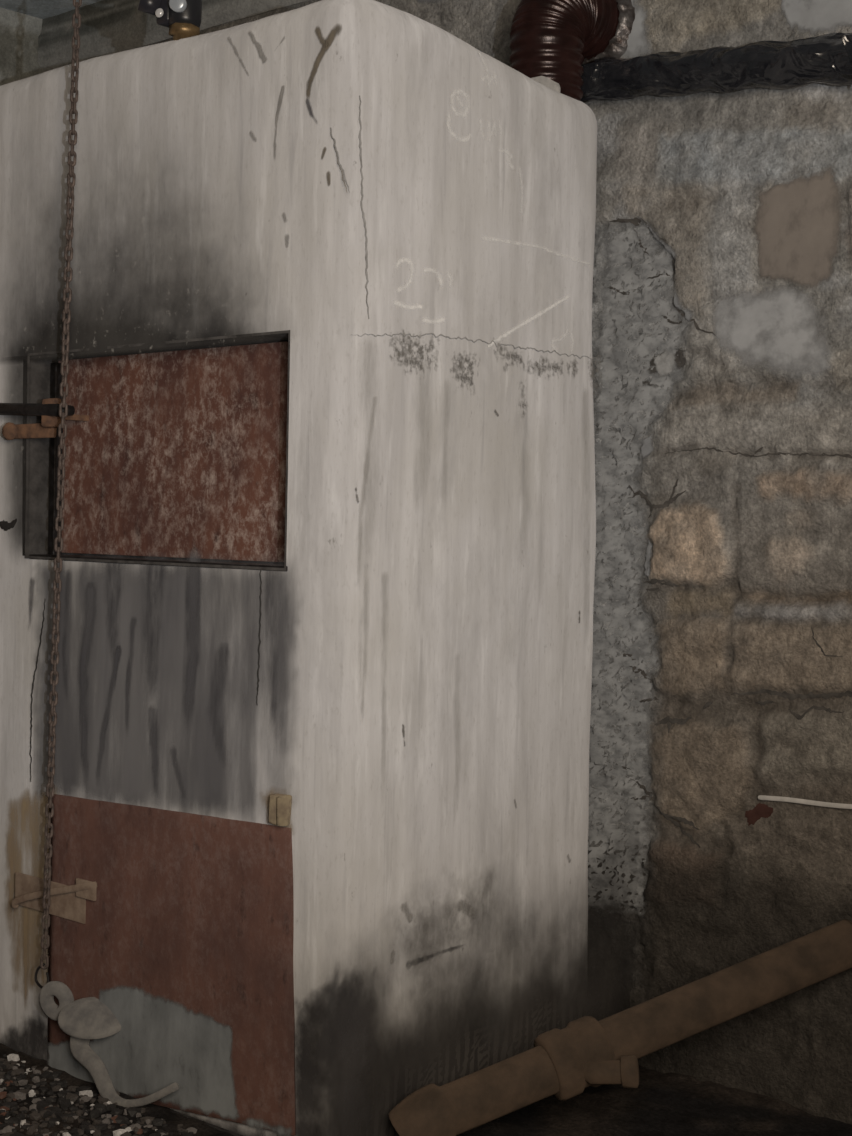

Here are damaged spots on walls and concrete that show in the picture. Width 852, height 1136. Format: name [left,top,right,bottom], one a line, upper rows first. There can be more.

crack [608,217,716,336]
crack [627,447,852,518]
crack [645,579,678,591]
damp [79,565,163,774]
damp [185,552,200,717]
crack [623,653,852,733]
crack [812,629,843,657]
spalling [745,803,773,826]